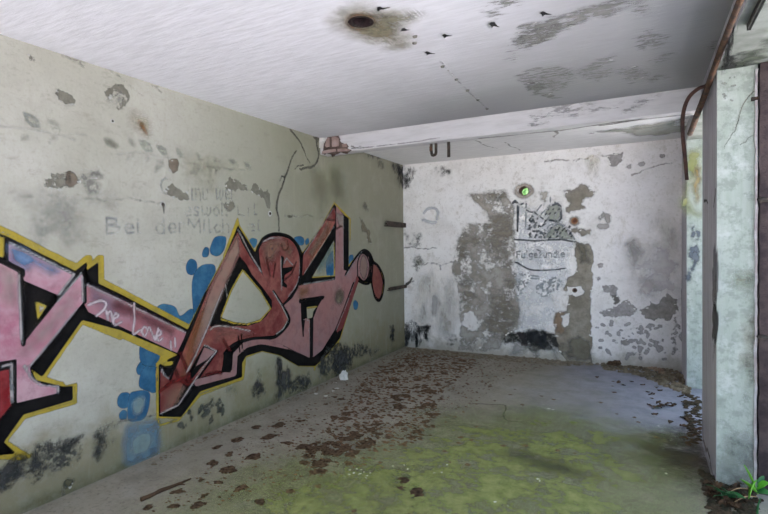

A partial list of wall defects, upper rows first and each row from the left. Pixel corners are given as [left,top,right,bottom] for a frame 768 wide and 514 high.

damp [347,11,408,40]
peeling [104,84,130,110]
spalling [319,136,351,157]
peeling [45,171,102,193]
peeling [224,176,272,217]
crack [276,129,319,231]
peeling [565,184,596,213]
peeling [452,192,519,351]
peeling [554,212,682,363]
damp [502,329,563,356]
damp [94,426,108,459]
damp [0,436,83,493]